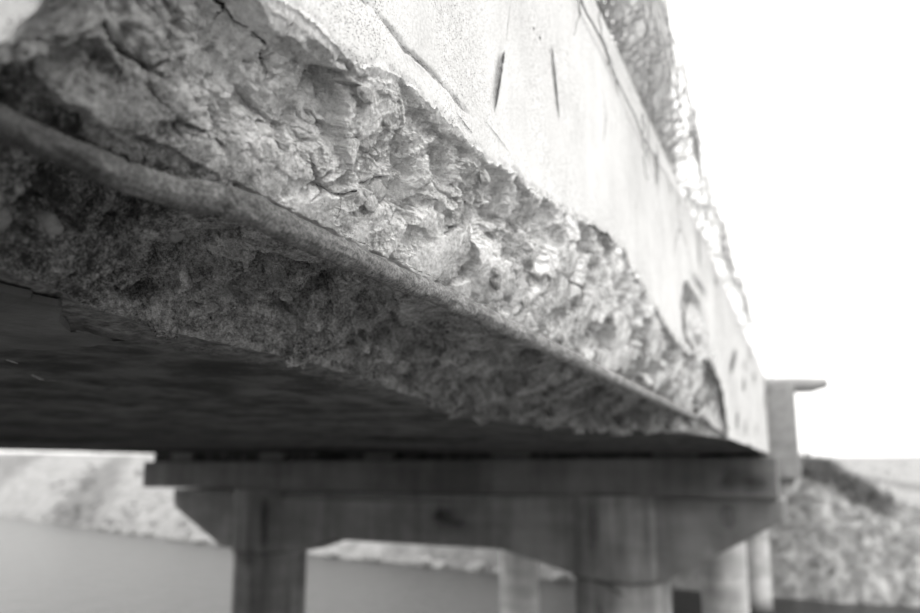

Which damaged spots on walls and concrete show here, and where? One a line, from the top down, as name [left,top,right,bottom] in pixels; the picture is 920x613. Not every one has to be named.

crack [213,0,268,79]
crack [382,21,508,150]
spalling [0,0,729,440]